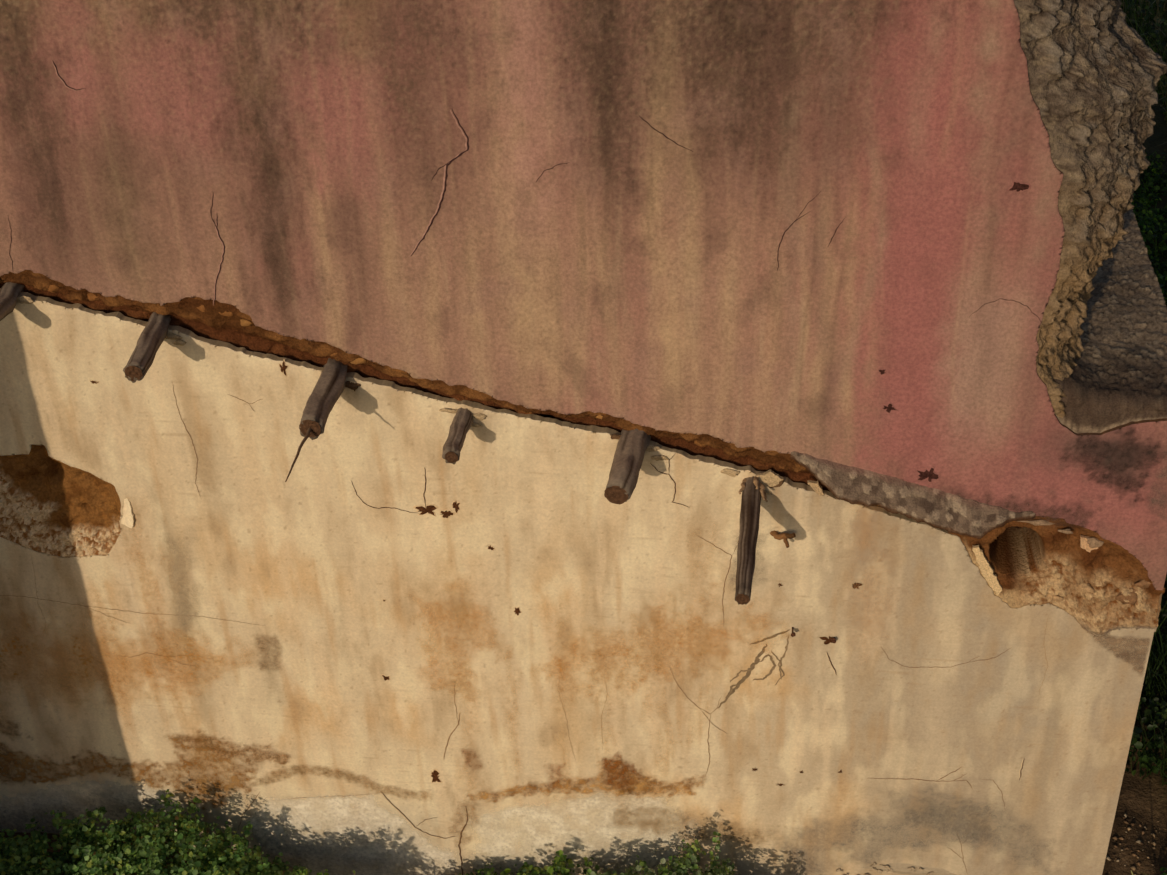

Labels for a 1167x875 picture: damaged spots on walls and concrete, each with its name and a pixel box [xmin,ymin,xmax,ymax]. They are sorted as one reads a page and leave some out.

crack [409,109,469,257]
flaking render [1007,181,1031,193]
spalling [0,445,134,557]
flaking render [756,470,784,487]
flaking render [807,480,824,496]
spalling [948,516,1165,637]
crack [669,666,723,773]